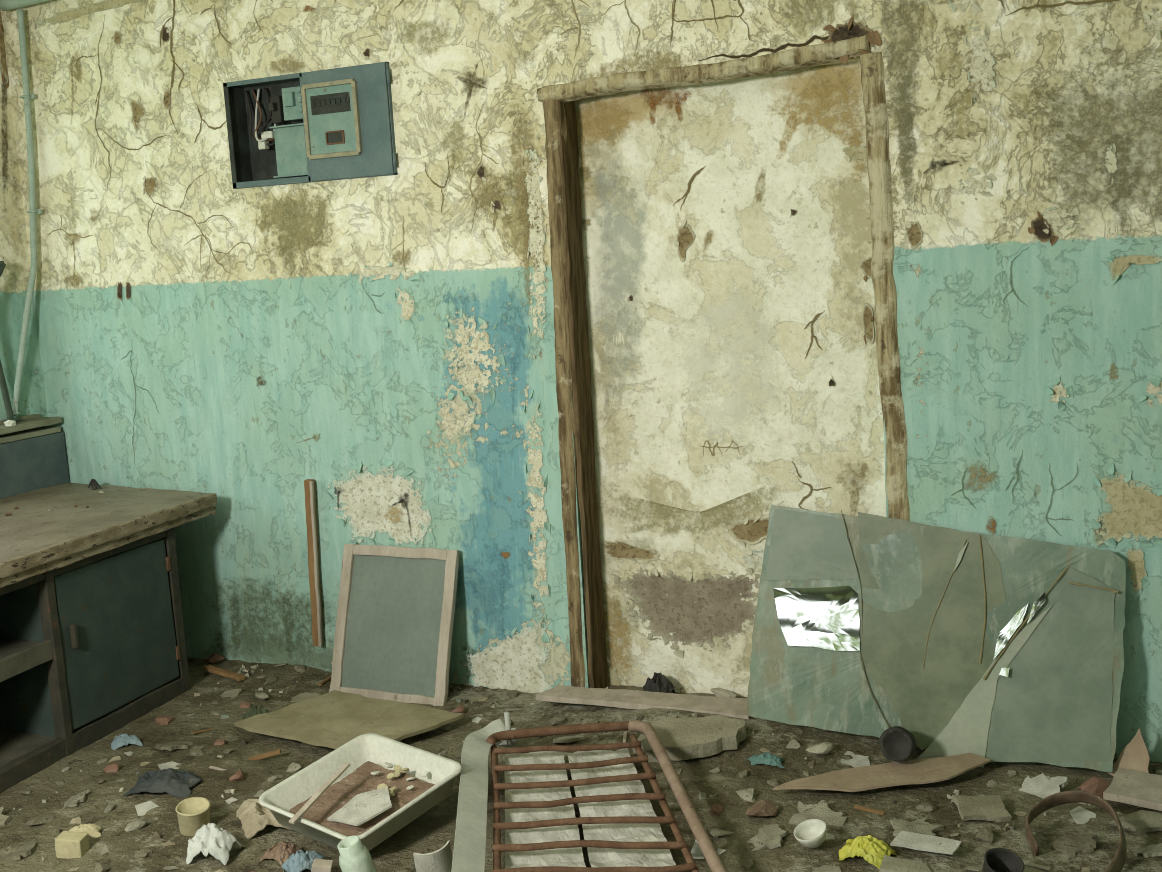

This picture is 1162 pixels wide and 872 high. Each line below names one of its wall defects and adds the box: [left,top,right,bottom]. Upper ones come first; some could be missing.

crack [76,0,231,187]
crack [670,0,840,62]
water stain [884,0,958,201]
crack [999,0,1119,16]
water stain [1045,79,1162,228]
crack [143,172,252,274]
flaking render [1028,207,1083,246]
peeling [433,307,507,445]
peeling [325,459,439,548]
peeling [459,390,557,693]
peeling [1088,462,1162,592]
water stain [222,583,313,652]